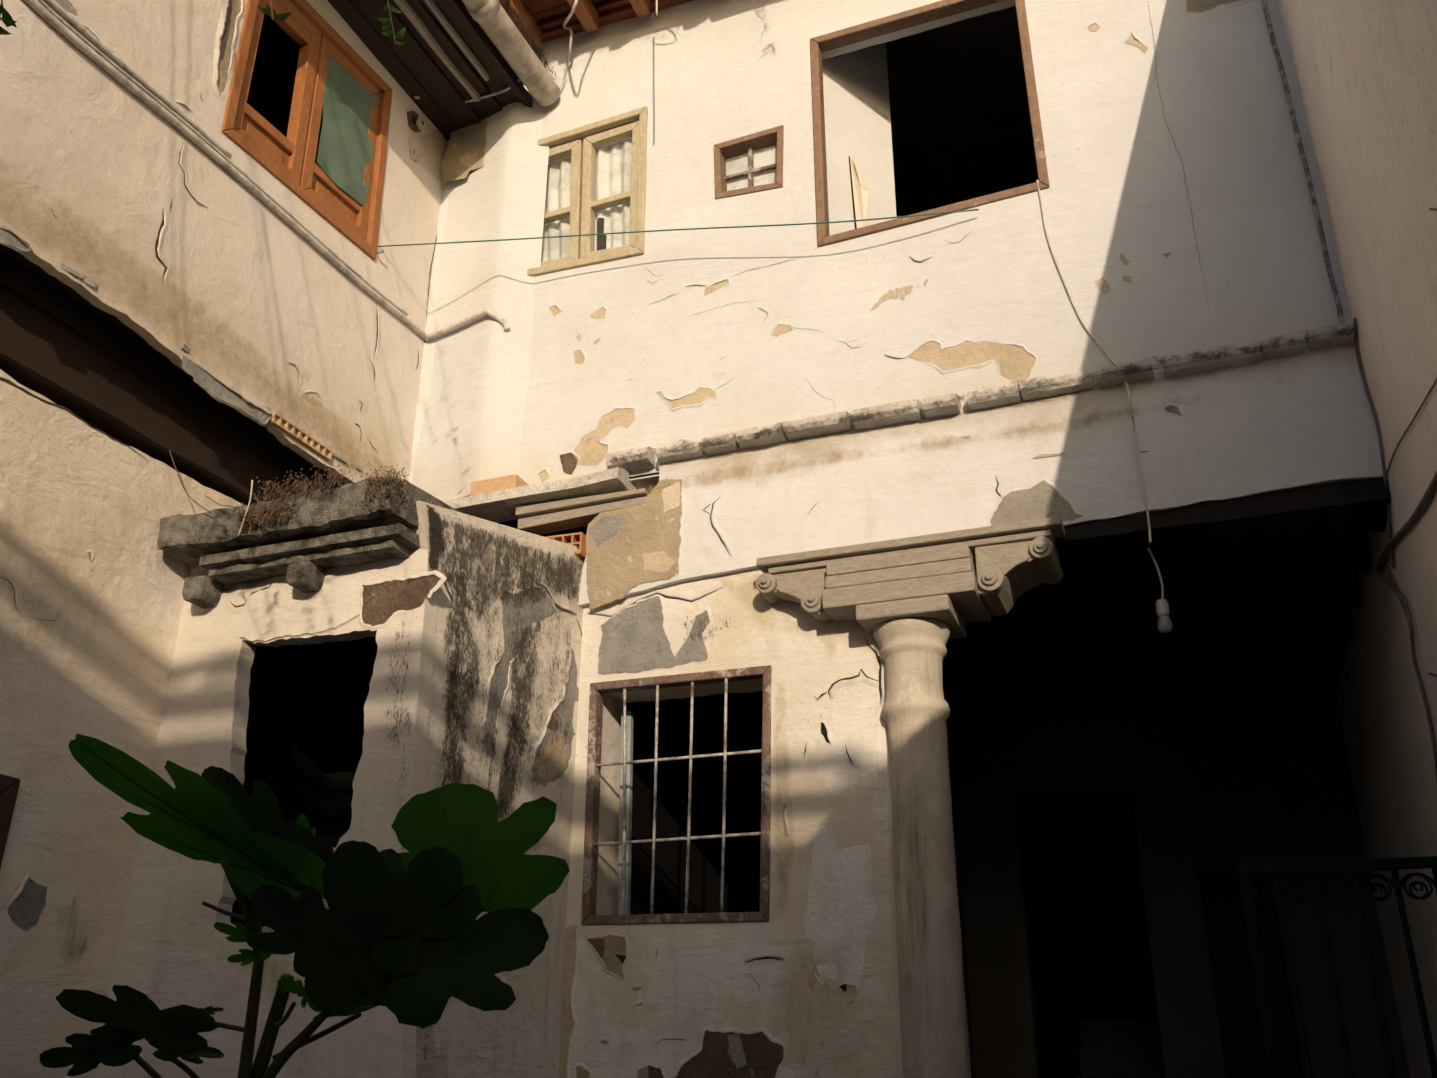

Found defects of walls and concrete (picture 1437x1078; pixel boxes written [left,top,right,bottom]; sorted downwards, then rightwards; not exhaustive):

crack [142,143,208,289]
crack [1148,5,1213,344]
peeling [907,338,1039,384]
peeling [537,406,637,483]
flaking render [239,570,447,643]
crack [444,575,472,609]
damp [432,516,583,823]
peeling [529,639,579,786]
crack [509,497,736,637]
spalling [540,472,714,675]
crack [804,634,886,756]
spalling [637,1025,788,1078]